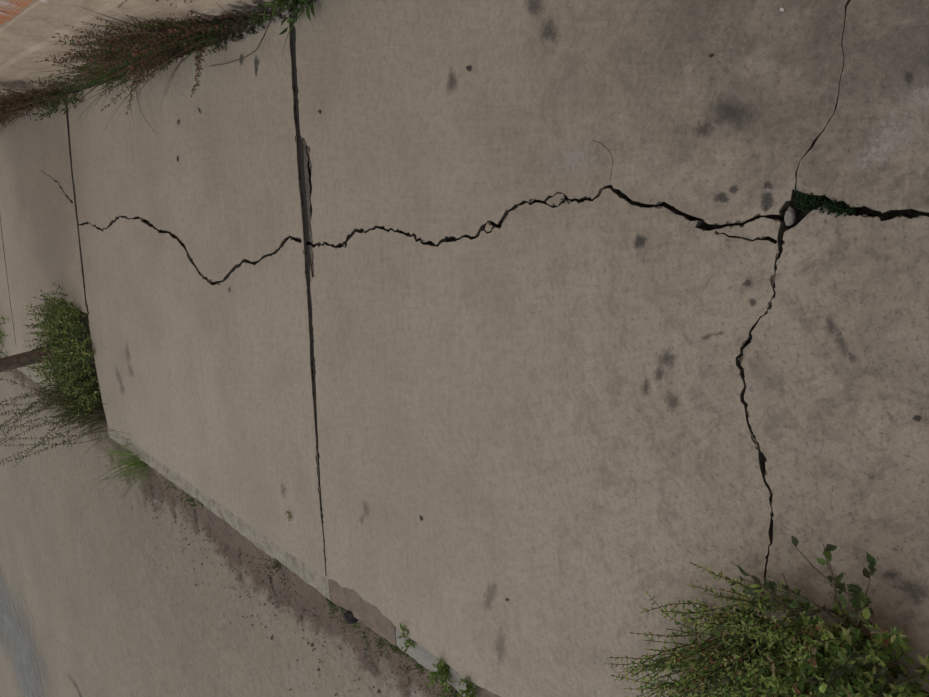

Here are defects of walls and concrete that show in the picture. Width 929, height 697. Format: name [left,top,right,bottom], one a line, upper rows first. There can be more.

crack [81,0,929,593]